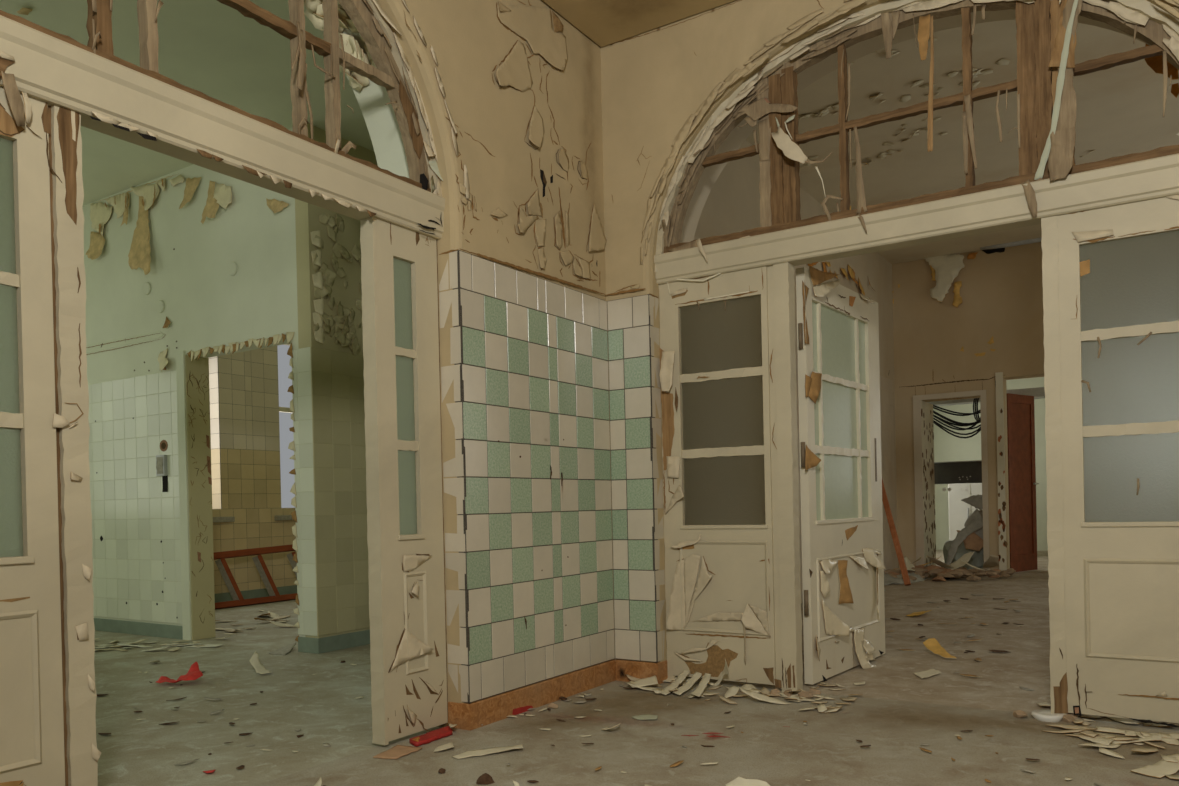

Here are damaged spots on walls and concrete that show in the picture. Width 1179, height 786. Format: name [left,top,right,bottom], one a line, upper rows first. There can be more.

peeling [0,50,232,275]
peeling [242,165,292,214]
peeling [309,189,377,356]
peeling [291,0,607,285]
peeling [640,0,1034,264]
peeling [802,262,876,344]
peeling [1021,0,1179,218]
peeling [1072,226,1179,243]
peeling [805,371,822,404]
spalling [134,332,300,641]
peeling [921,409,936,566]
peeling [388,677,443,742]